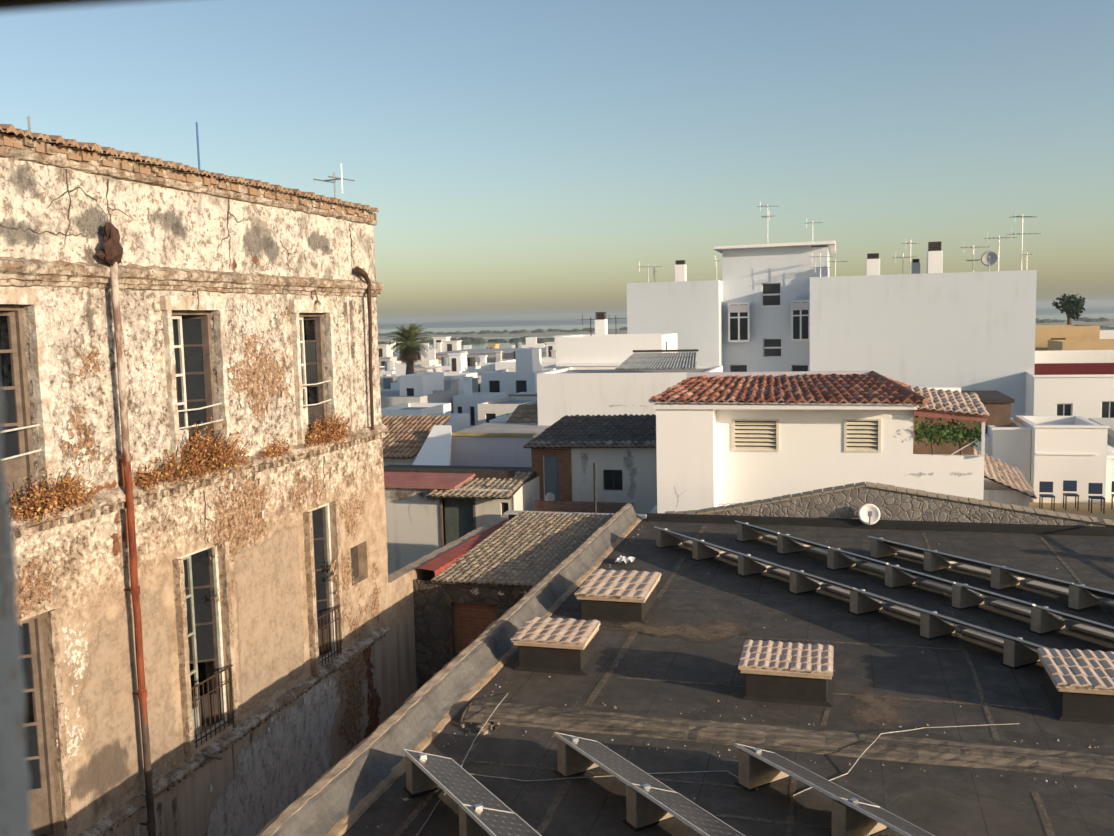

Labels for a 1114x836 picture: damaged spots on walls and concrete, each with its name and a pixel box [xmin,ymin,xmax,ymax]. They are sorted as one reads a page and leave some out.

crack [0,169,134,240]
crack [217,198,246,270]
spalling [217,297,294,421]
peeling [334,304,367,412]
rust [114,511,129,557]
spalling [185,473,269,603]
peeling [207,463,389,836]